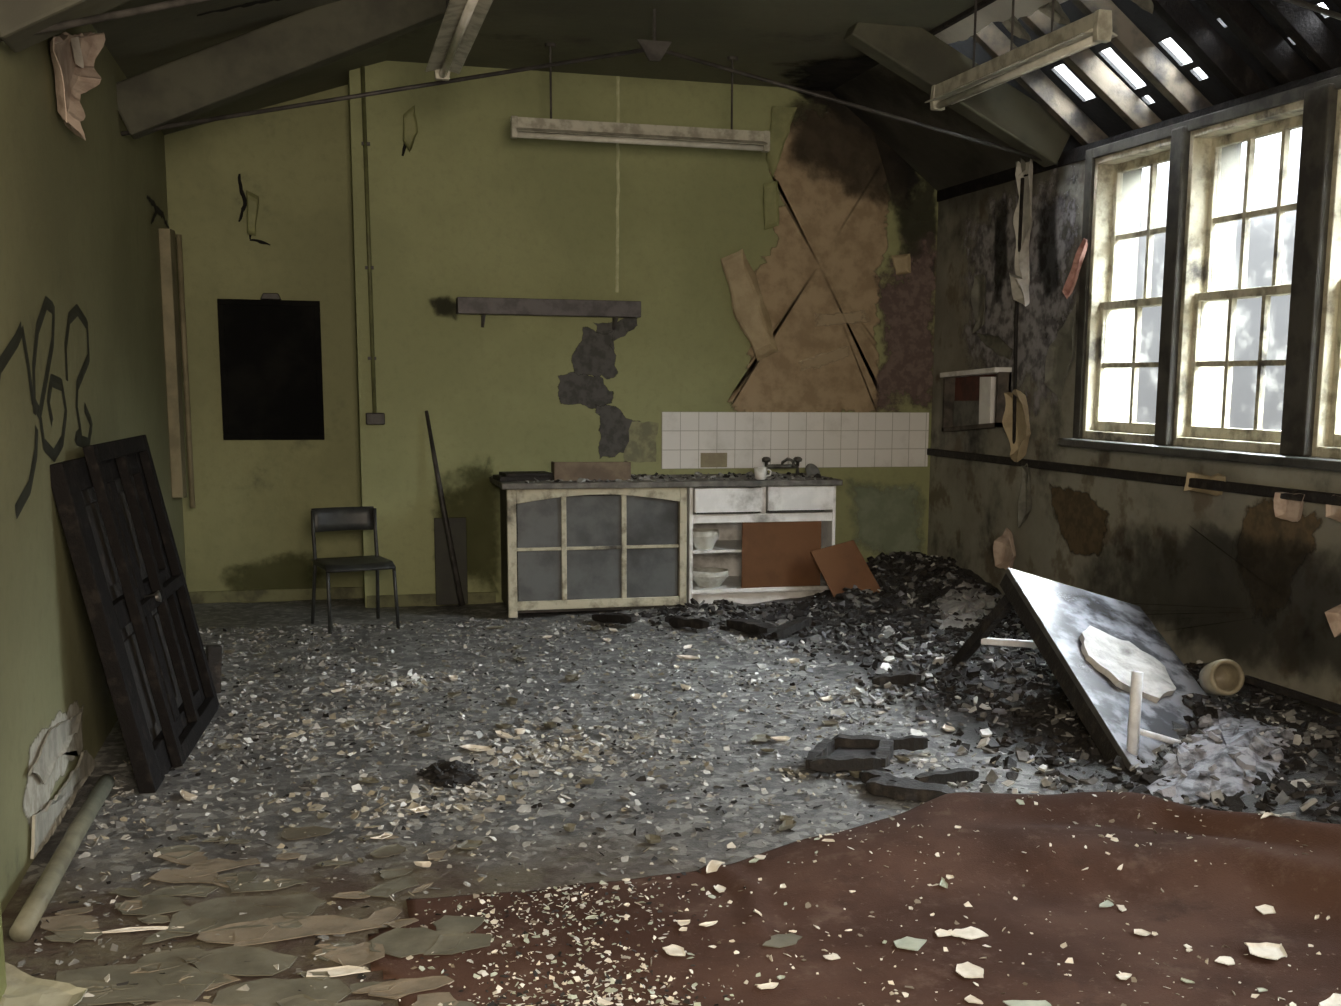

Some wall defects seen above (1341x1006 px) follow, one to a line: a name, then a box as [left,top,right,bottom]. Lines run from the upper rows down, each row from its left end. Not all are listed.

peeling [721,97,911,412]
flaking render [558,318,659,463]
flaking render [962,158,1088,570]
flaking render [1049,484,1110,556]
flaking render [1184,472,1226,496]
flaking render [1239,492,1341,555]
flaking render [1325,604,1341,637]